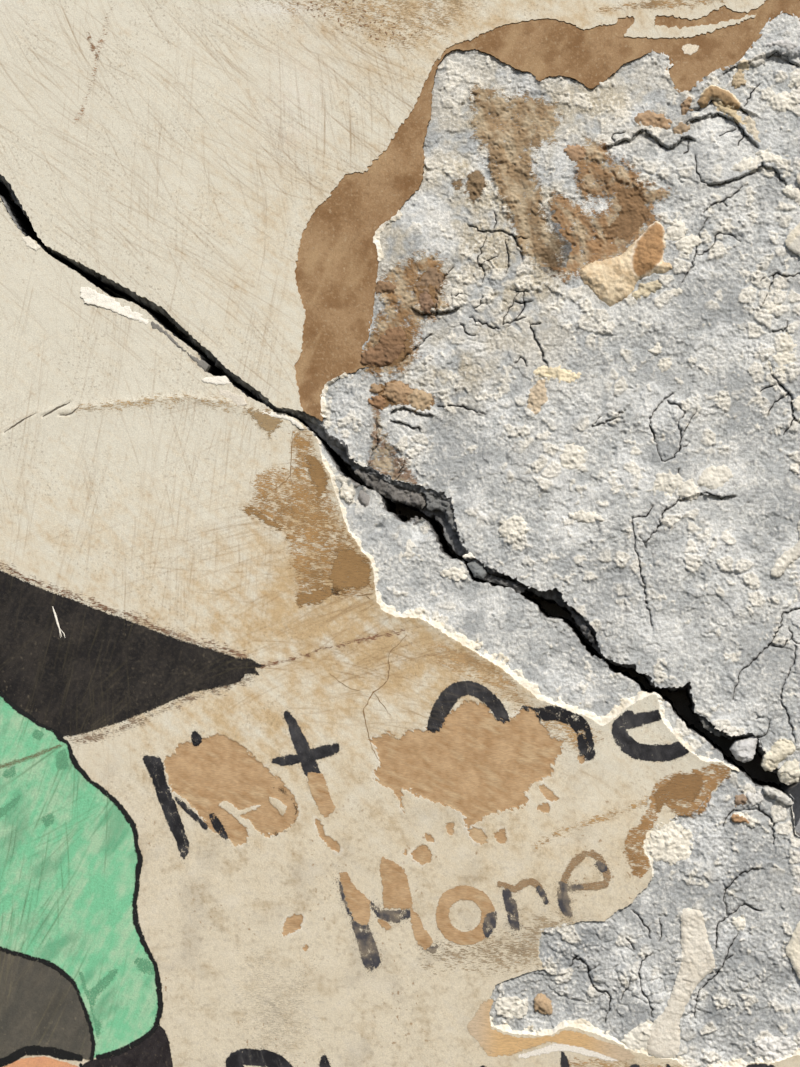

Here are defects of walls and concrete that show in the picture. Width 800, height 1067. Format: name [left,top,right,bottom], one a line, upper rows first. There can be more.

crack [607,52,798,282]
crack [0,174,800,843]
spalling [289,0,800,1067]
peeling [164,733,299,847]
peeling [282,913,303,936]